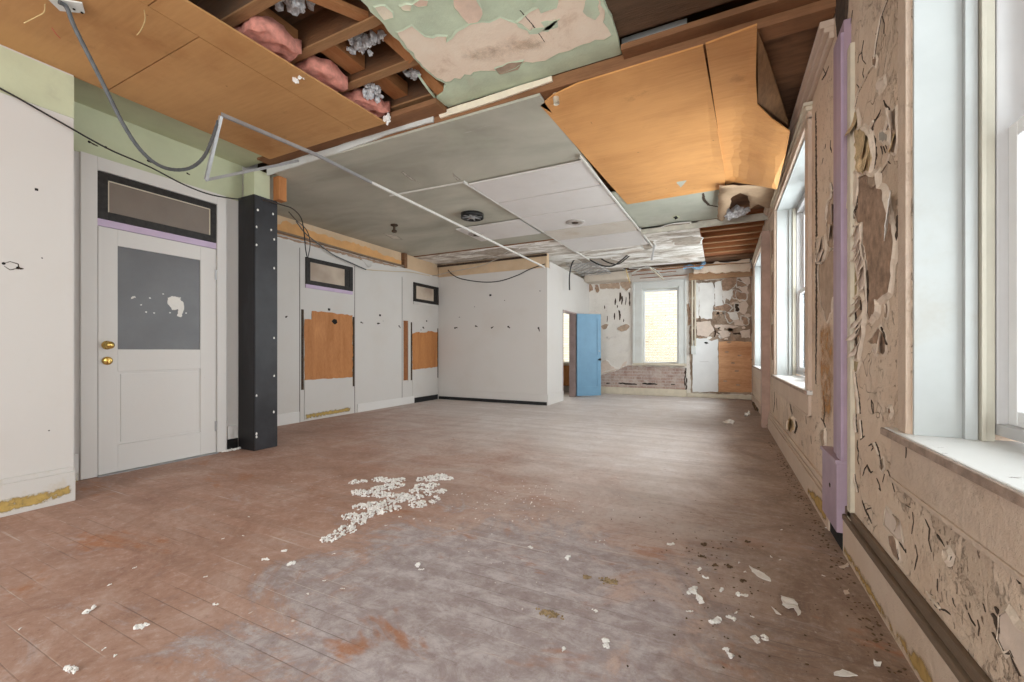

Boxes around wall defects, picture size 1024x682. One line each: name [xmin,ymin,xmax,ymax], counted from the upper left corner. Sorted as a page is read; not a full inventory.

peeling [372,0,614,83]
peeling [878,104,898,156]
peeling [641,215,703,250]
flaking render [815,190,833,324]
flaking render [846,166,898,374]
flaking render [601,277,752,395]
peeling [883,505,904,564]
peeling [942,545,955,567]
peeling [991,603,1024,681]